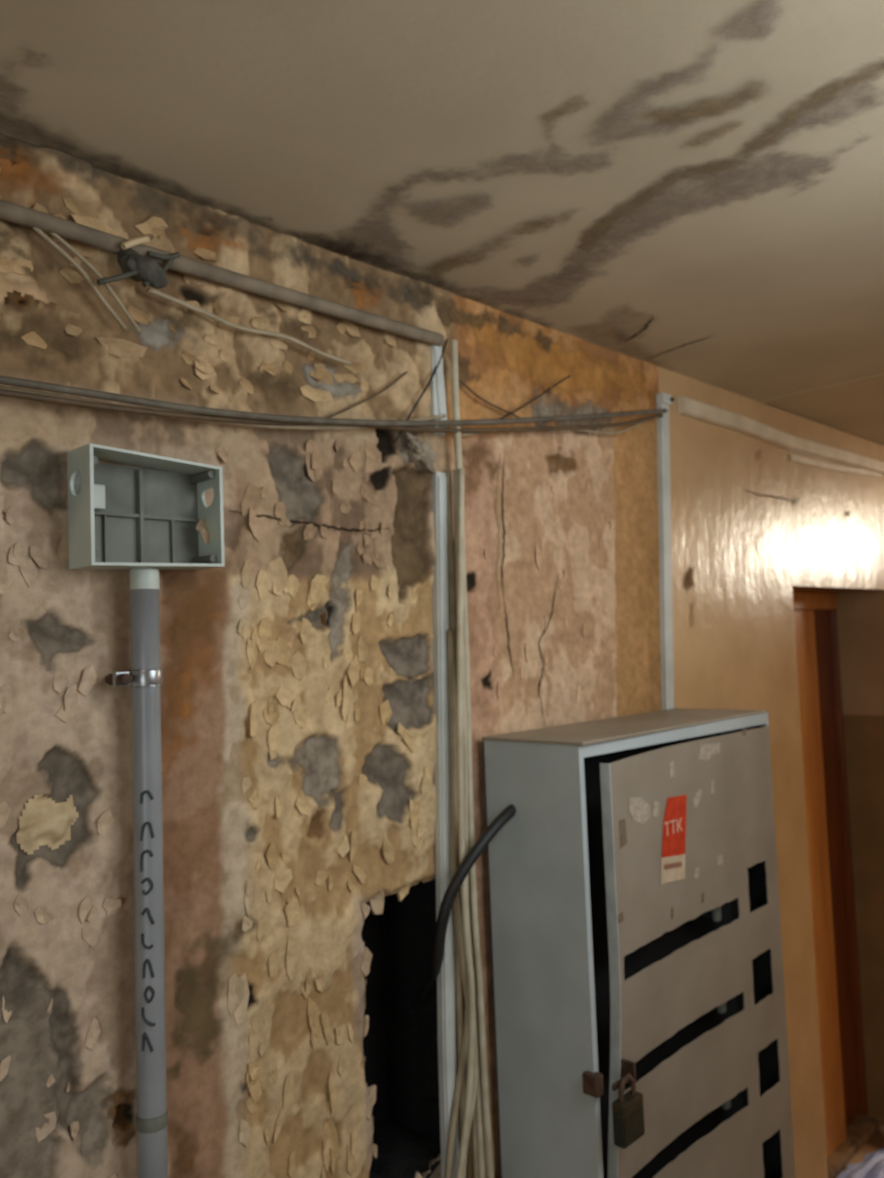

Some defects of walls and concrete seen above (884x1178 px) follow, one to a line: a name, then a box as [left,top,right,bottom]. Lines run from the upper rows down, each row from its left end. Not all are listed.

water stain [0,63,884,351]
water stain [0,314,79,359]
water stain [248,369,299,401]
peeling [274,300,369,402]
flaking render [0,440,66,525]
flaking render [9,613,97,722]
crack [229,510,389,532]
peeling [238,429,432,892]
crack [496,453,559,718]
flaking render [0,746,115,924]
flaking render [0,947,112,1178]
spalling [242,843,441,1178]